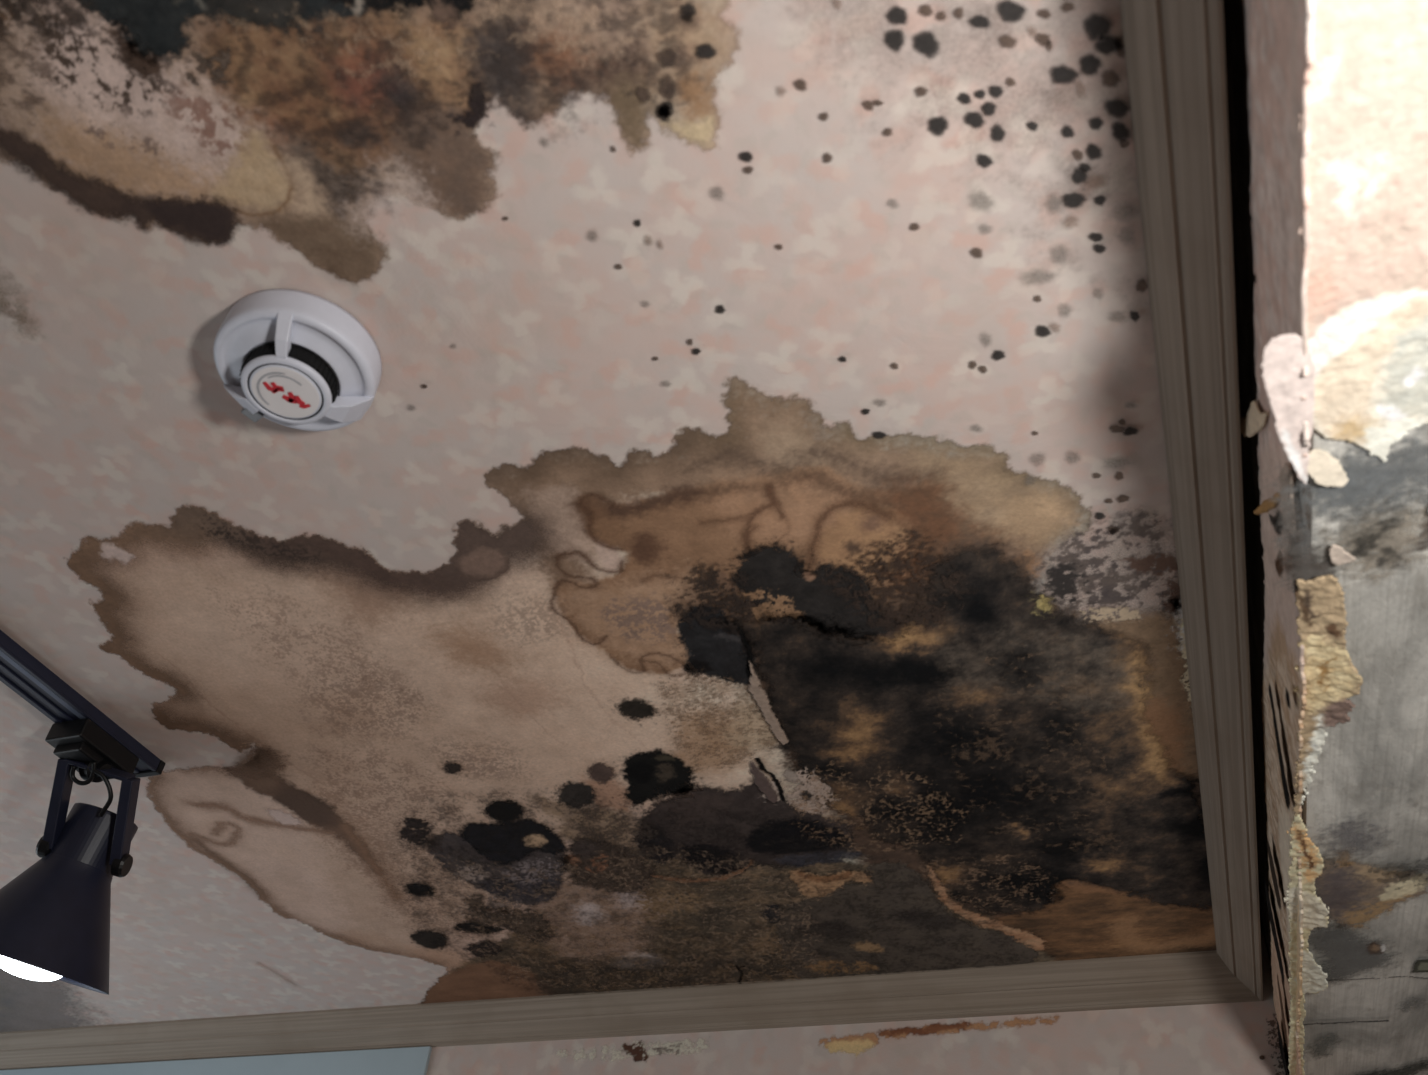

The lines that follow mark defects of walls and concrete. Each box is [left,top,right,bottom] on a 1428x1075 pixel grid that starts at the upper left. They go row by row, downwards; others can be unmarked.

damp [886,0,1074,58]
damp [0,0,739,283]
damp [740,152,754,174]
damp [929,117,948,136]
damp [959,77,1016,168]
damp [1042,14,1133,241]
damp [970,338,1005,373]
peeling [1240,400,1268,437]
peeling [1254,448,1349,536]
peeling [1329,544,1356,566]
damp [67,376,1216,1004]
spalling [1412,959,1428,973]